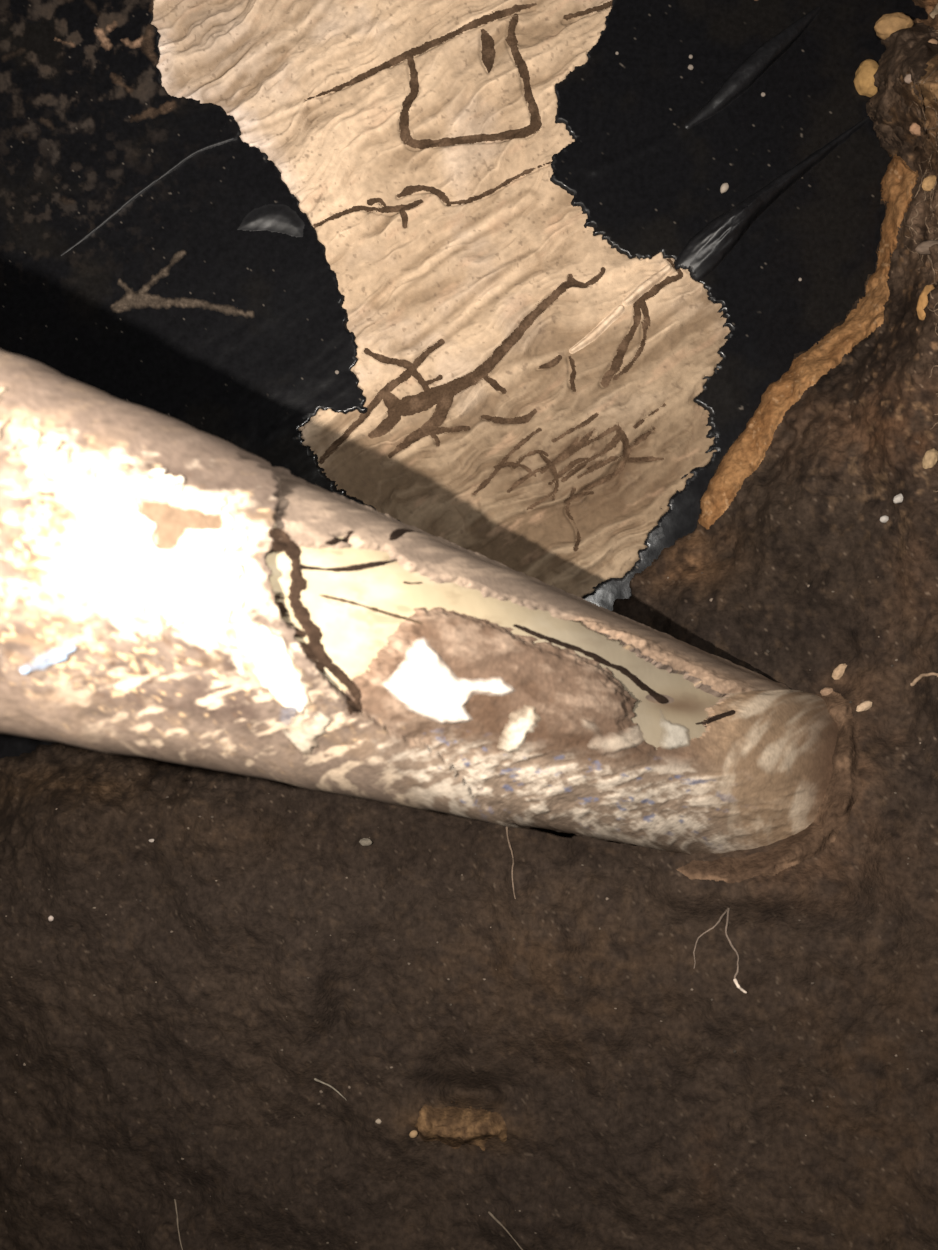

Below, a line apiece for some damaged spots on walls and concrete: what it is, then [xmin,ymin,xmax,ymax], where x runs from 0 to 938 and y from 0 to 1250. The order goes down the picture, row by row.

crack [318,259,683,552]
crack [268,527,422,715]
peeling [384,640,513,724]
peeling [499,706,540,752]
crack [513,624,669,704]
peeling [584,720,643,755]
peeling [660,720,690,749]
crack [696,710,735,727]